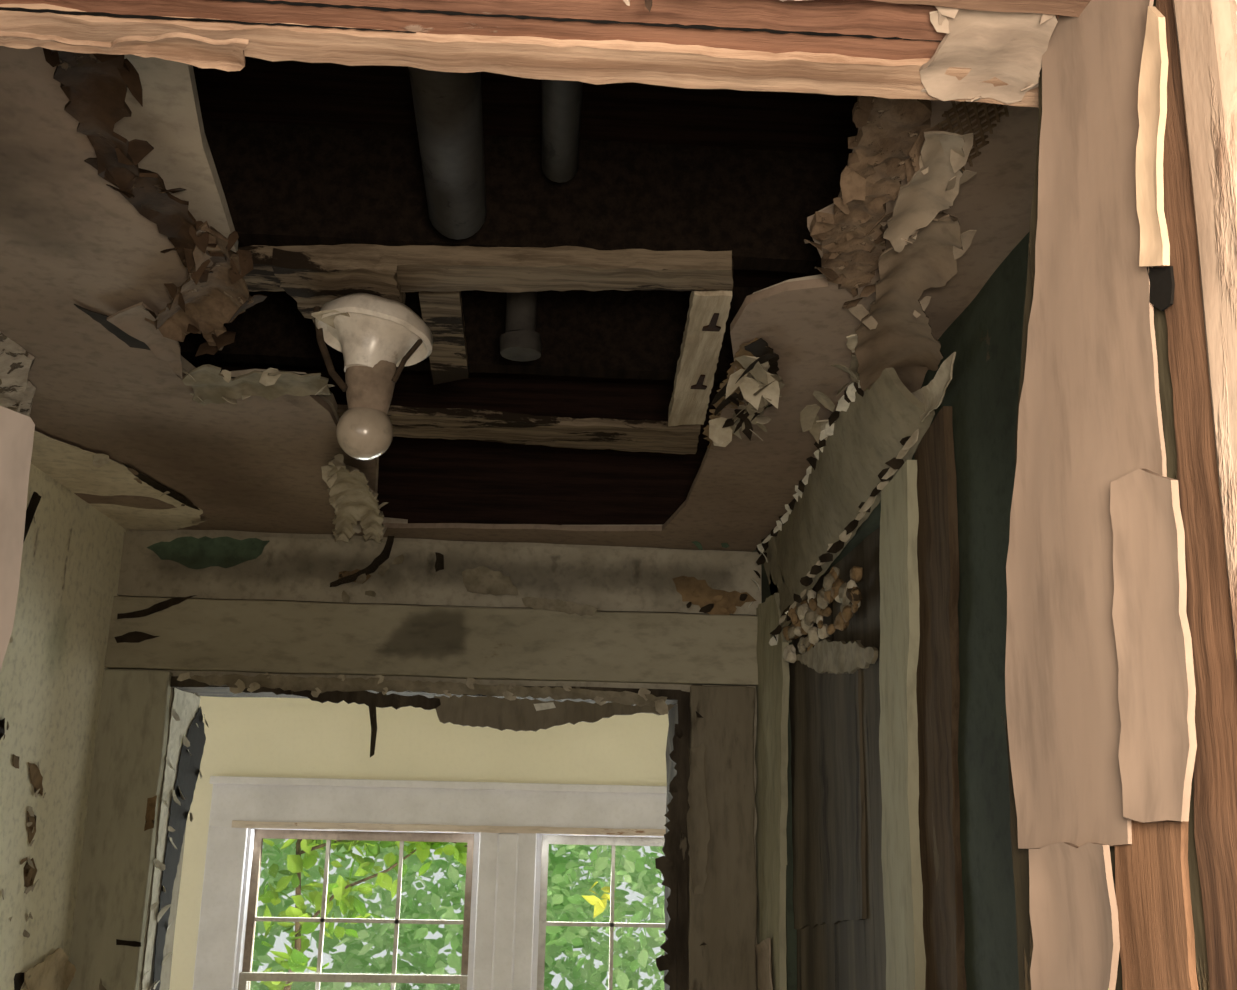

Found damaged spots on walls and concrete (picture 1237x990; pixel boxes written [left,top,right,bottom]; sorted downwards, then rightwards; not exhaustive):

peeling [259,368,281,386]
spalling [703,338,785,449]
peeling [800,0,1197,990]
spalling [672,576,756,615]
spalling [782,566,878,674]
spalling [0,718,9,740]
peeling [534,702,556,711]
peeling [13,754,46,894]
peeling [142,688,201,990]
peeling [655,856,673,871]
peeling [669,744,710,895]
peeling [656,955,671,971]